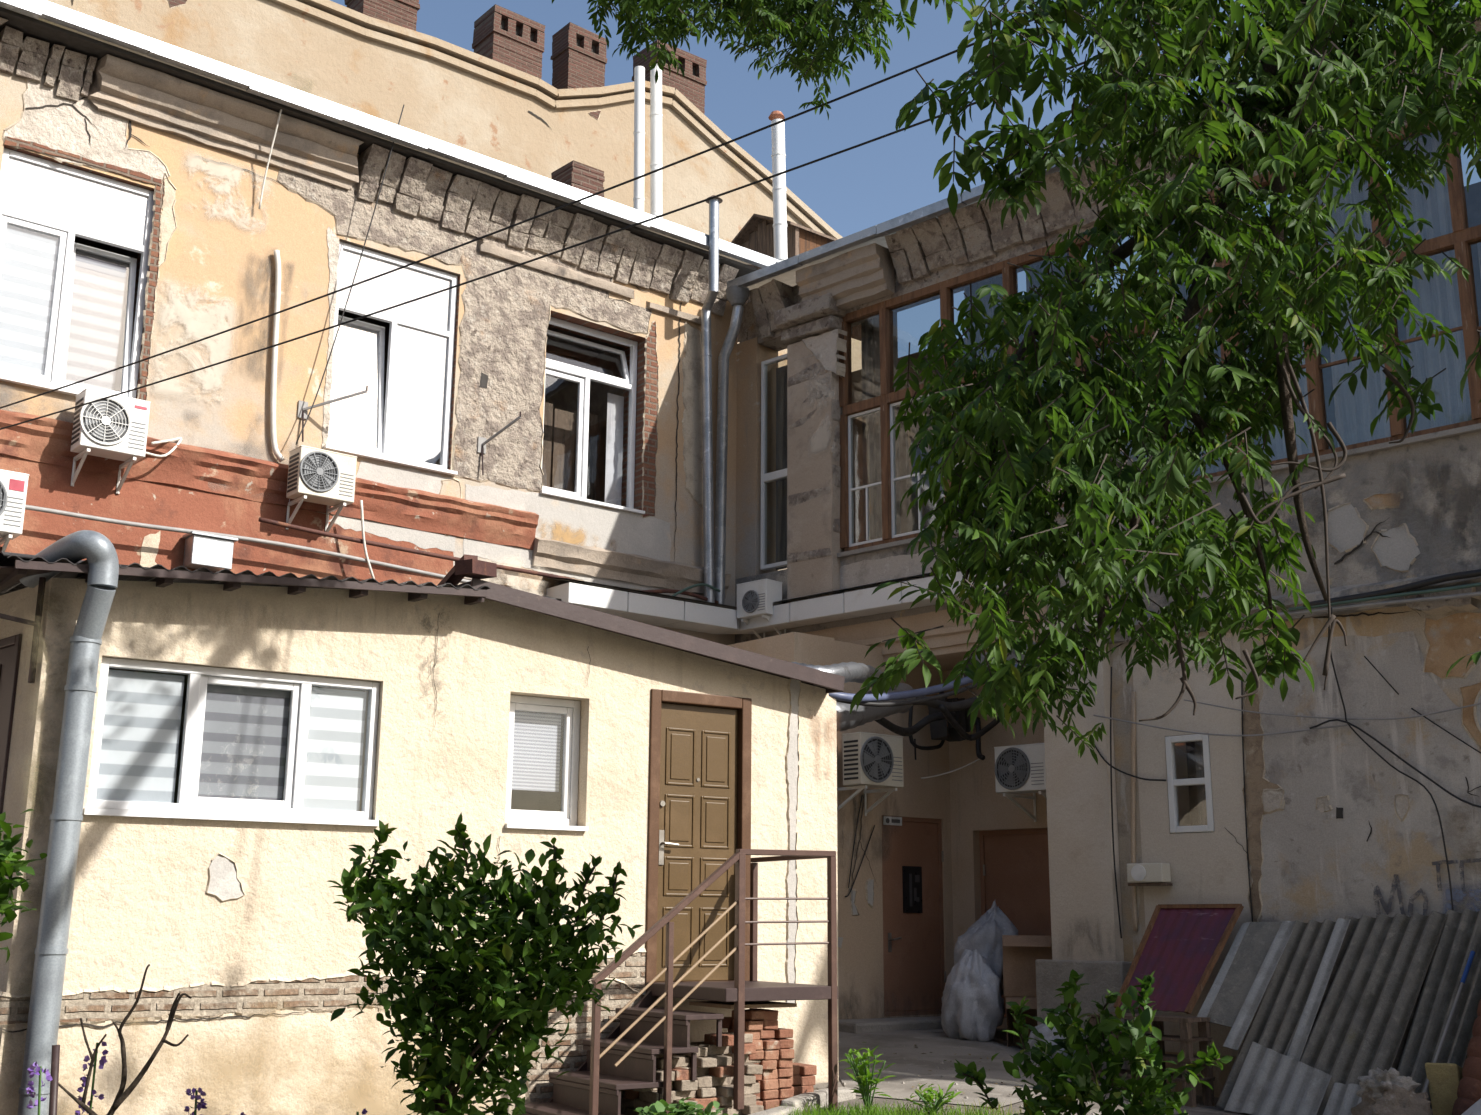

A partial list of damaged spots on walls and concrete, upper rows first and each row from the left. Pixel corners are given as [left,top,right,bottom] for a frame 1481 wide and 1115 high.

crack [26,96,150,148]
spalling [1327,491,1420,572]
spalling [1241,587,1481,923]
peeling [205,853,245,902]
spalling [0,991,31,1028]
spalling [59,971,429,1027]